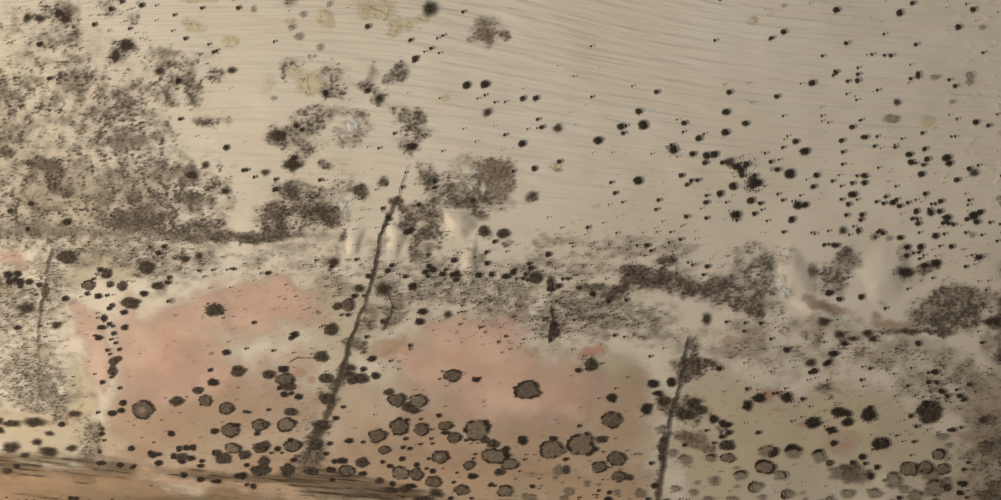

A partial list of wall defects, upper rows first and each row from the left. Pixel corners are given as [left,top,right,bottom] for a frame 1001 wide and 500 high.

damp [320,63,350,100]
damp [462,80,506,117]
damp [617,108,648,135]
crack [294,166,408,467]
crack [654,336,689,500]